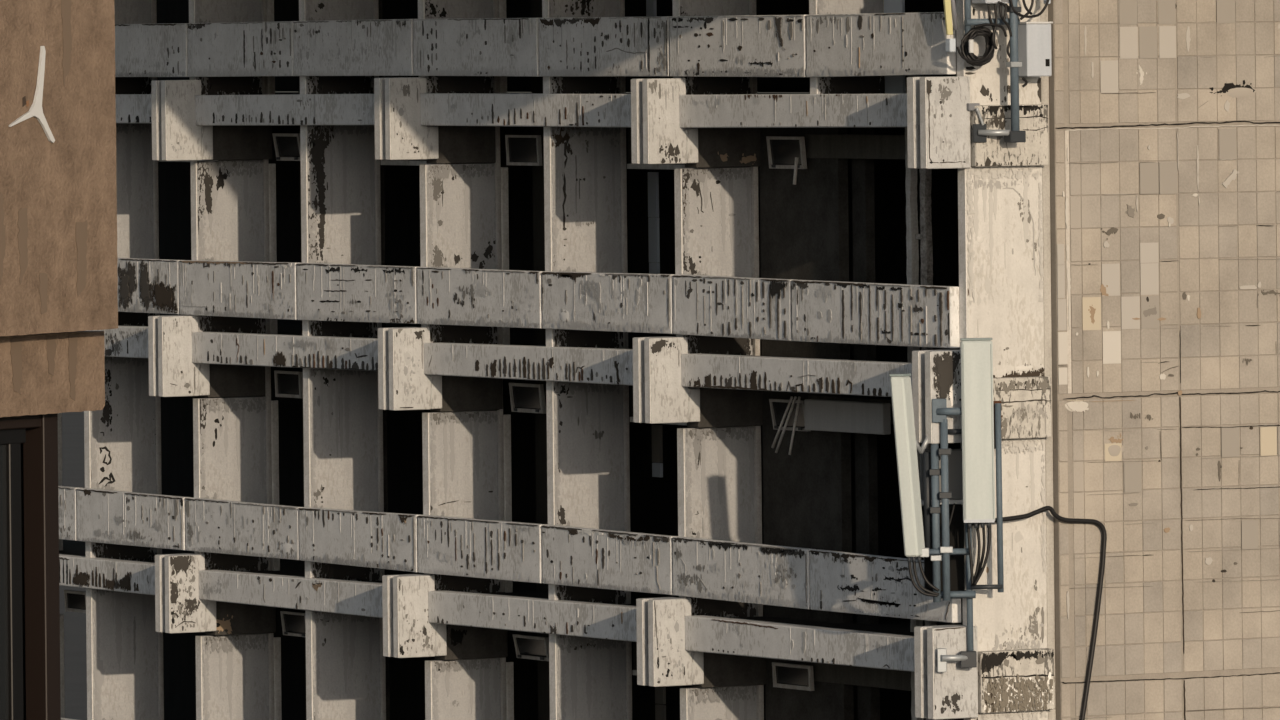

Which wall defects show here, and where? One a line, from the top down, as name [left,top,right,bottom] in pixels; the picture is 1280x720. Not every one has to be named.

damp [967,85,1044,314]
spalling [119,262,178,314]
damp [994,347,1049,591]
spalling [568,529,650,574]
damp [972,525,983,574]
spalling [73,572,131,592]
damp [934,607,1056,720]
peeling [982,672,1053,713]